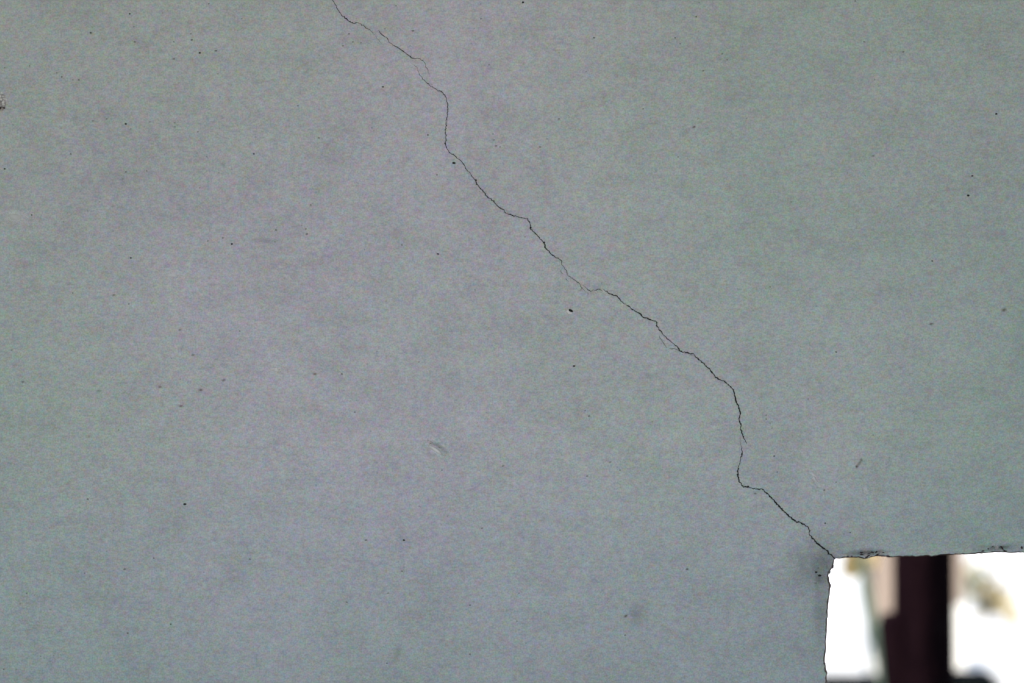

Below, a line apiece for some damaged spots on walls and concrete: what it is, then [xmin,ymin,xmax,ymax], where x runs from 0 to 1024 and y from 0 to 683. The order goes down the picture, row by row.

crack [332,0,836,559]